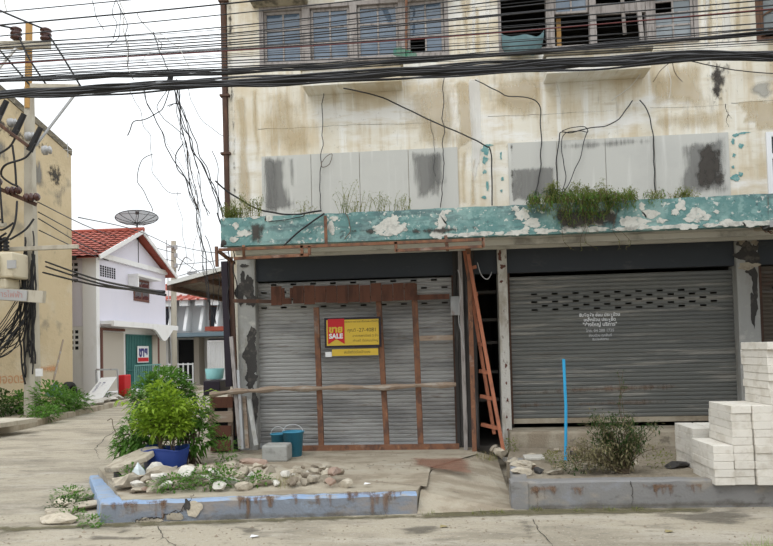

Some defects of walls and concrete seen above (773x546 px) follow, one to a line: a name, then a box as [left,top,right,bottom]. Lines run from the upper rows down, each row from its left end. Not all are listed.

leakage [712,67,725,96]
leakage [469,79,481,178]
leakage [265,160,290,210]
leakage [414,154,441,195]
leakage [512,168,553,200]
leakage [684,140,724,193]
peeling [220,217,252,248]
peeling [327,215,338,235]
peeling [372,214,408,236]
peeling [430,197,773,328]
peeling [234,264,257,307]
peeling [242,326,259,423]